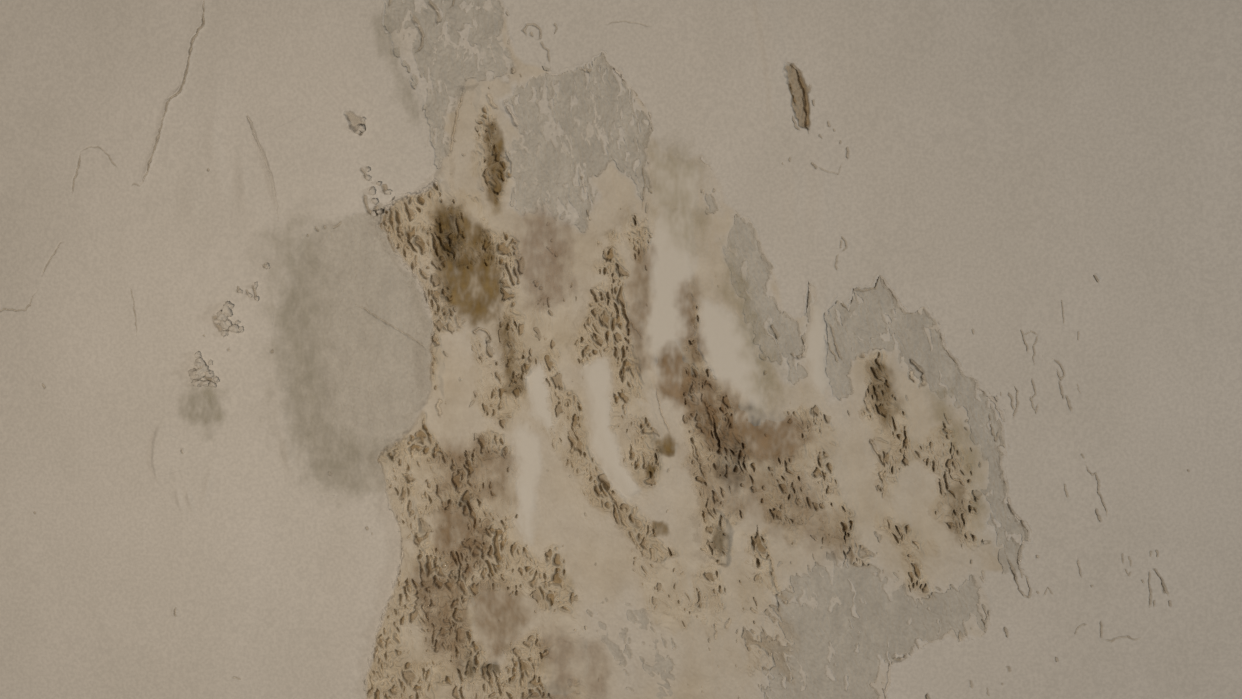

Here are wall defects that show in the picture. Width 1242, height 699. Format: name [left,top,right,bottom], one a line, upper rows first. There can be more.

crack [137,0,214,185]
flaking render [188,0,1045,699]
water stain [660,354,795,459]
peeling [1074,447,1114,529]